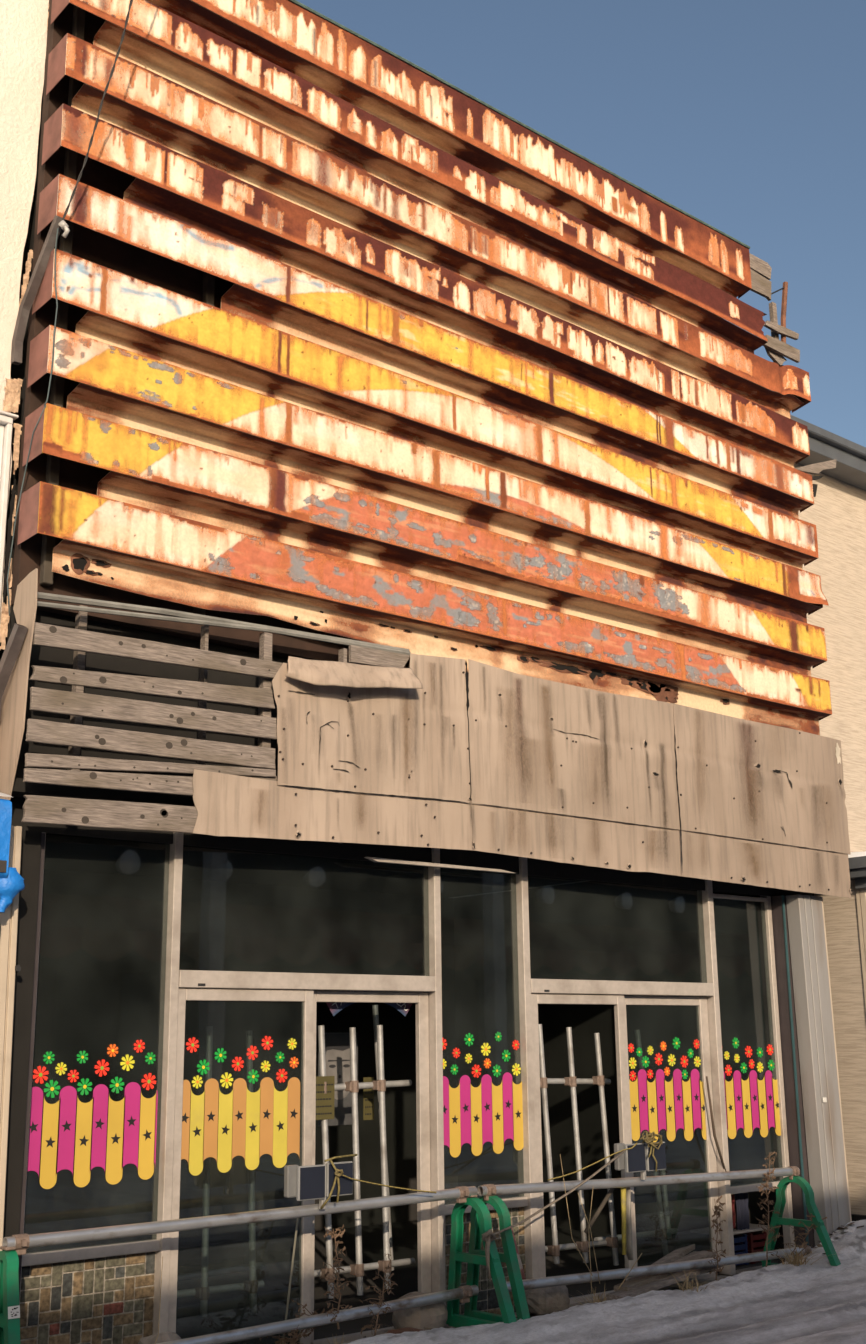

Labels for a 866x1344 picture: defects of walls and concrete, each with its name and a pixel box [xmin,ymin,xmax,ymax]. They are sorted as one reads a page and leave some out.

peeling [304,492,495,563]
peeling [649,531,760,559]
peeling [394,574,434,618]
peeling [458,596,521,631]
peeling [523,612,563,627]
peeling [514,553,690,614]
peeling [558,641,746,692]
leakage [743,725,753,811]